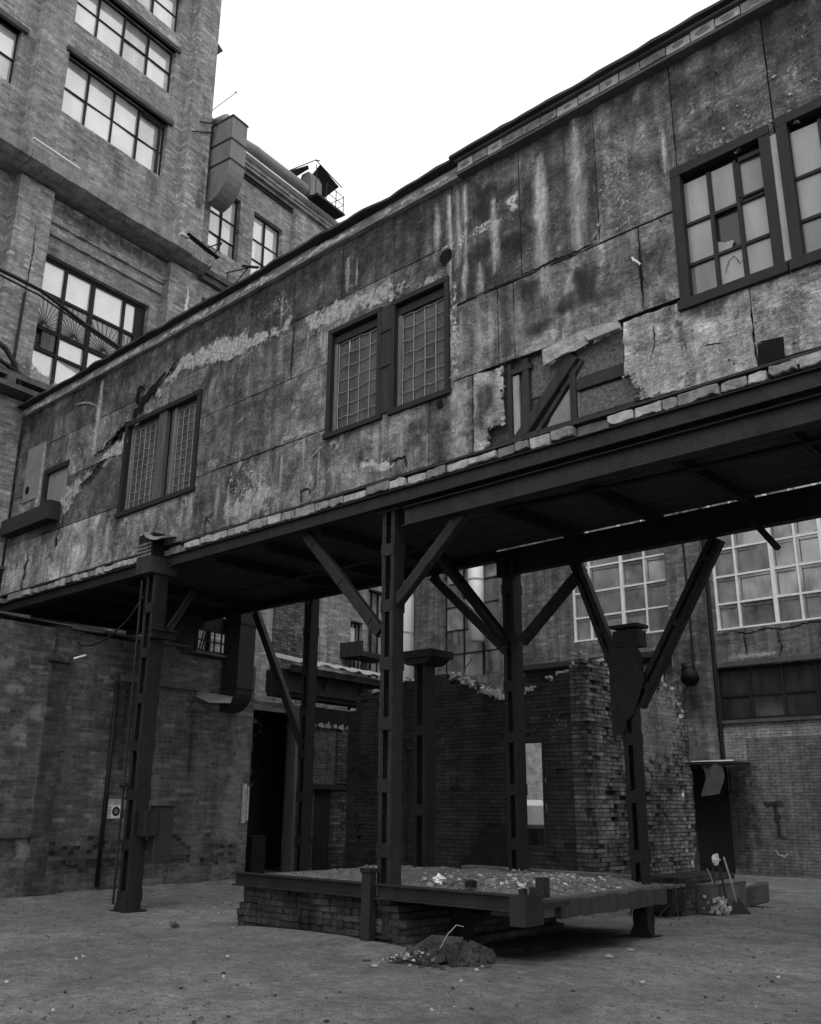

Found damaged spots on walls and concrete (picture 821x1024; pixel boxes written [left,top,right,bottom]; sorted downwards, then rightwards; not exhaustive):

peeling [376,177,447,218]
water stain [535,180,545,226]
peeling [290,227,359,267]
water stain [557,262,599,313]
crack [638,239,655,356]
spalling [147,275,441,412]
water stain [513,320,548,335]
spalling [622,313,728,402]
crack [72,358,178,488]
spalling [60,431,128,523]
crack [718,621,821,656]